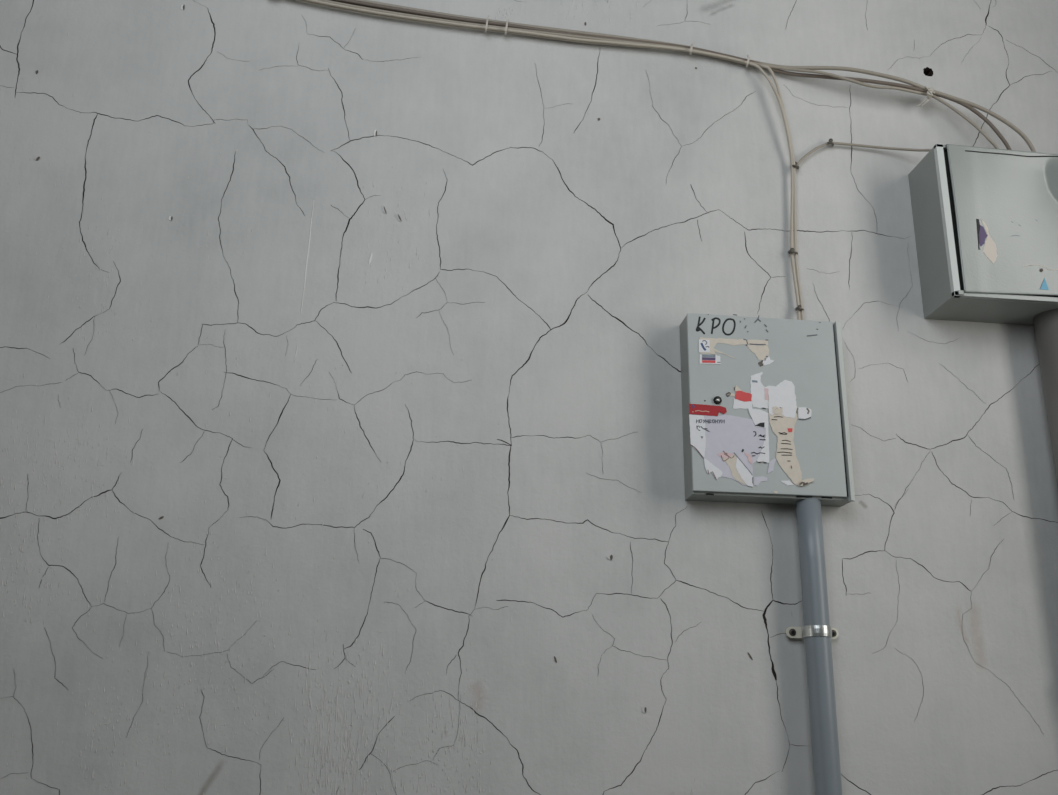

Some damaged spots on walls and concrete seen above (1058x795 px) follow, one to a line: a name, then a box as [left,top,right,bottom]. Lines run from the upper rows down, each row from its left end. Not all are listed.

crack [889,0,1055,146]
crack [772,134,906,287]
crack [0,0,802,795]
crack [814,285,913,379]
crack [842,365,1058,722]
crack [982,770,1057,795]